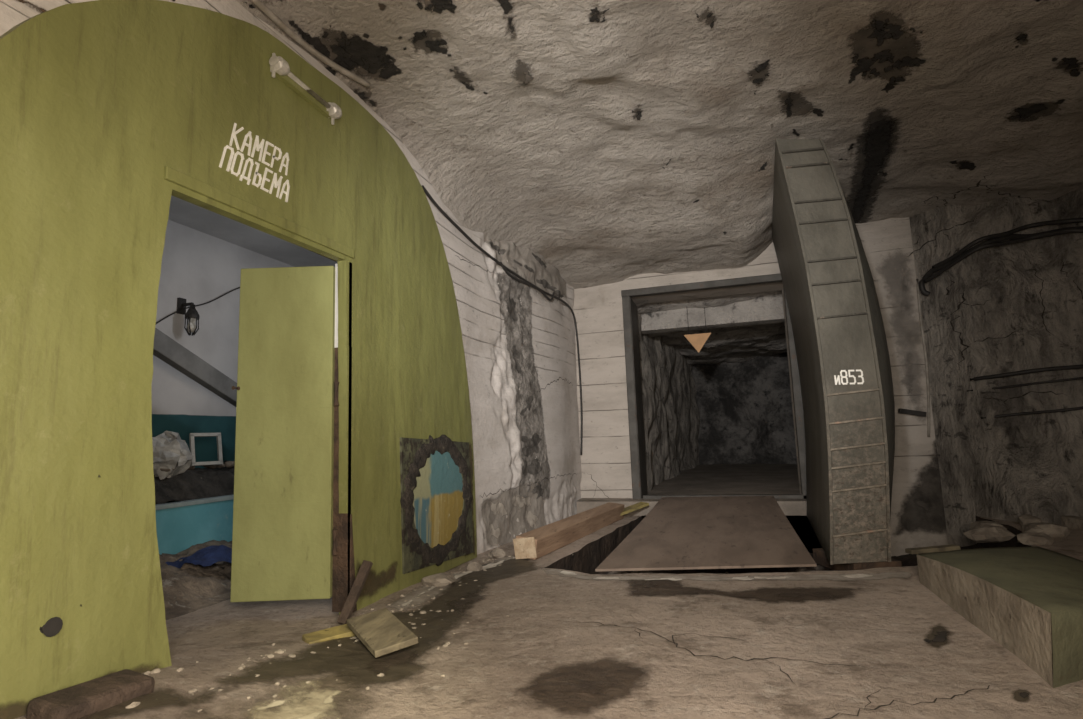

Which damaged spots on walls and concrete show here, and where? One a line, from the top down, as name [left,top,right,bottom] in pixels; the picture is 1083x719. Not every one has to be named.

damp [839,118,895,224]
damp [78,555,911,719]
crack [574,622,990,719]